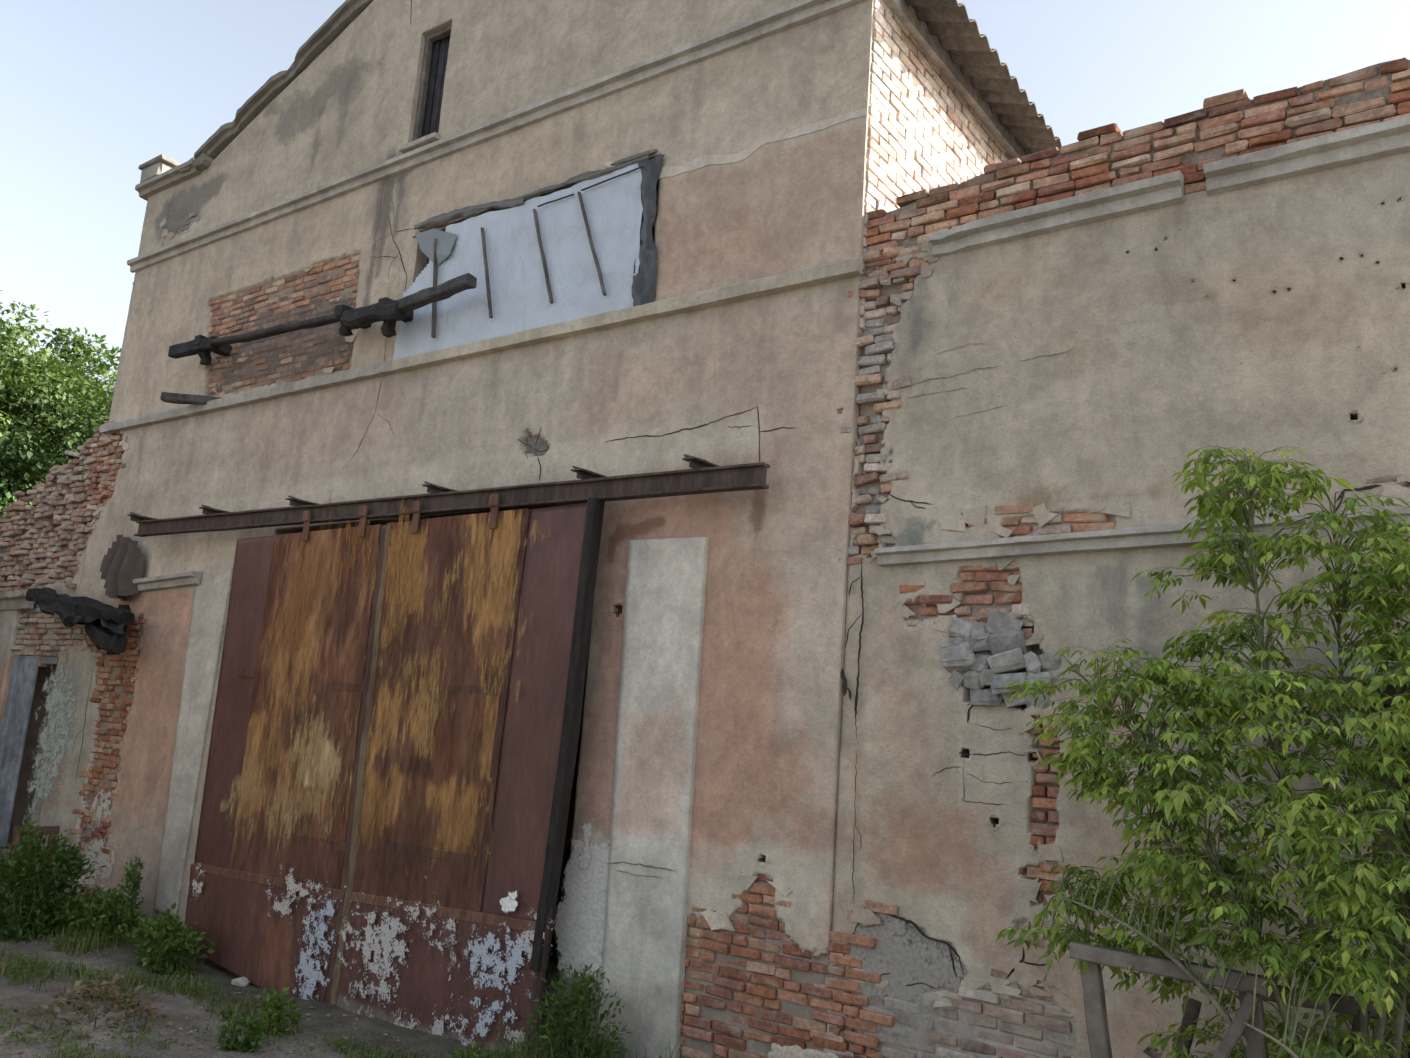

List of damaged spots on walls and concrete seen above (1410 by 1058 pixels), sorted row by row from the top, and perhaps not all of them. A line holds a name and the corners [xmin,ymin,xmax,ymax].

flaking render [0,421,130,592]
flaking render [198,253,360,396]
crack [606,407,794,462]
flaking render [836,241,938,566]
crack [910,343,1073,417]
rust [363,511,535,647]
rust [221,695,352,839]
rust [398,657,440,755]
crack [835,552,964,1057]
crack [933,701,1030,805]
flaking render [679,708,1081,1058]
peeling [266,865,555,1051]